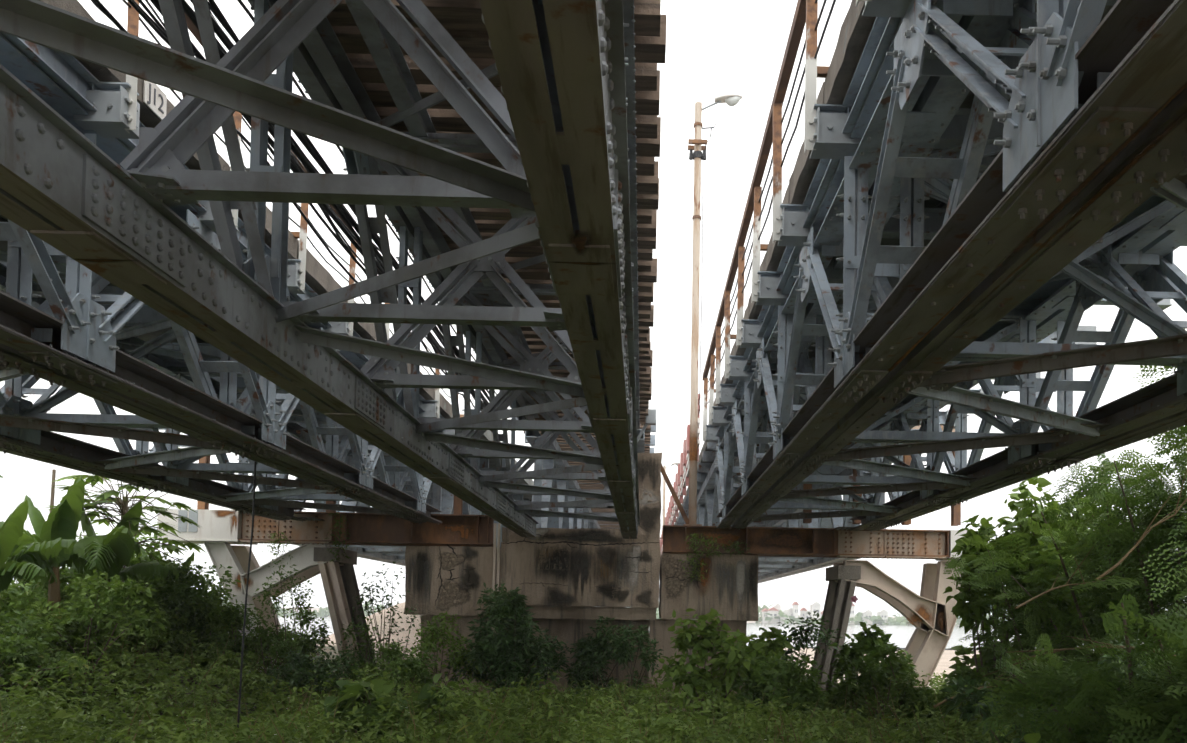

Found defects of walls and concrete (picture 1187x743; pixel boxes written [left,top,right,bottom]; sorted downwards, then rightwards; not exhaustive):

water stain [538,529,652,605]
water stain [714,561,758,606]